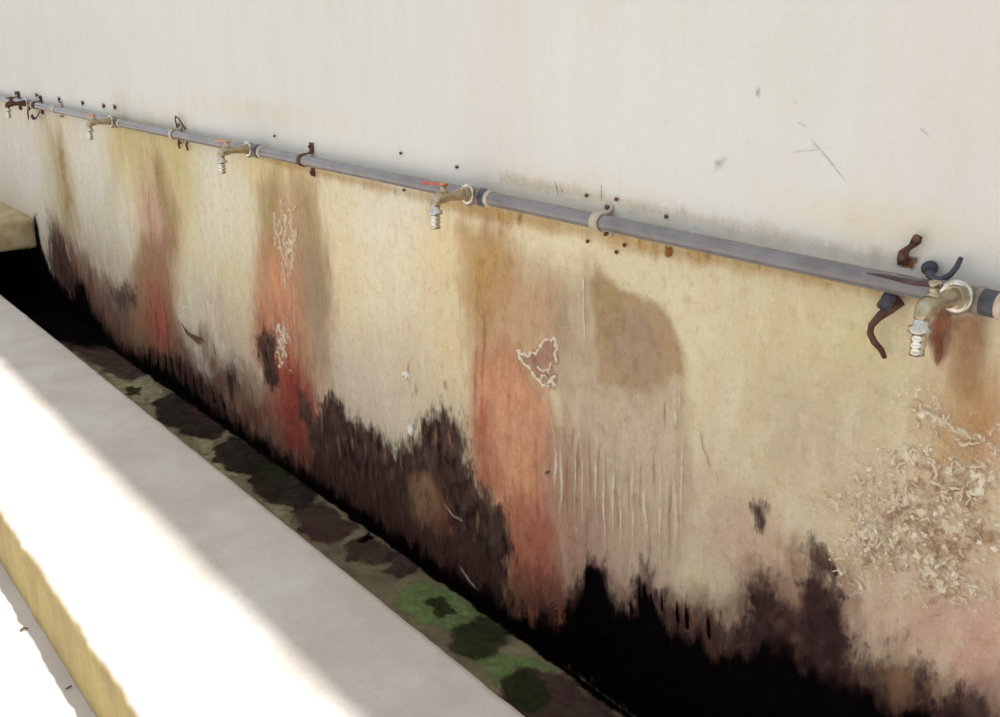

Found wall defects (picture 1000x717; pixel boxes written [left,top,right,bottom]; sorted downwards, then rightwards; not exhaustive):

rust [130,167,174,353]
leakage [273,199,298,290]
rust [258,191,323,459]
leakage [1,217,1000,717]
rust [473,247,591,632]
flaking render [516,336,559,389]
rust [929,309,983,392]